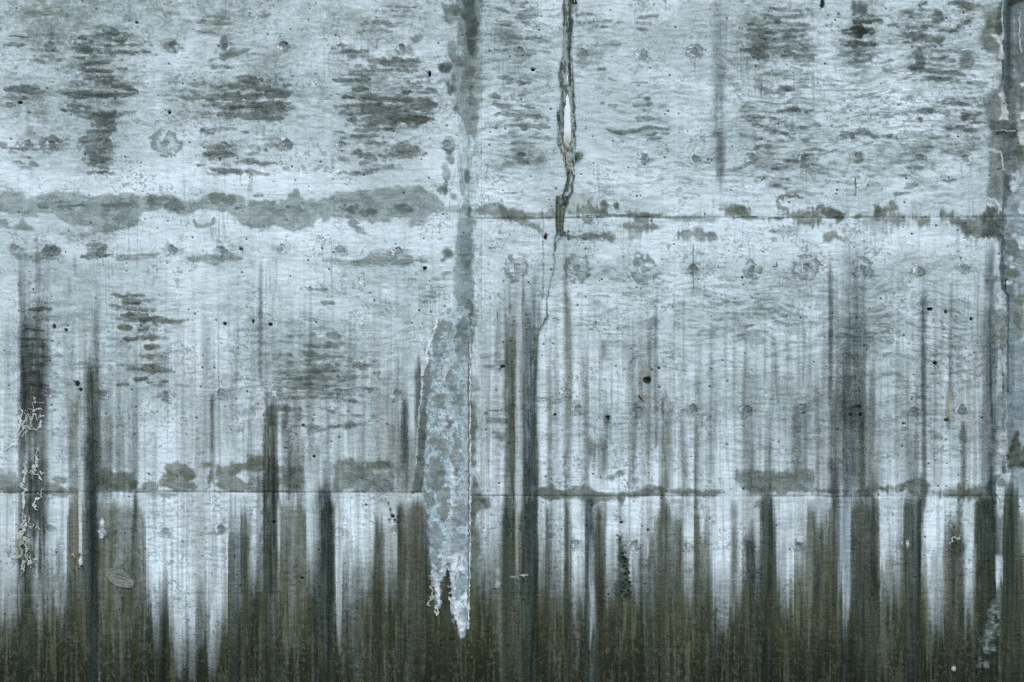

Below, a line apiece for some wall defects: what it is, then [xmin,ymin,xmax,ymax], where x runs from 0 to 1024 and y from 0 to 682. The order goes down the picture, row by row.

water stain [438,0,484,135]
crack [533,0,582,363]
water stain [477,203,541,231]
water stain [568,200,661,241]
water stain [674,214,716,240]
water stain [725,194,905,241]
water stain [1011,295,1024,336]